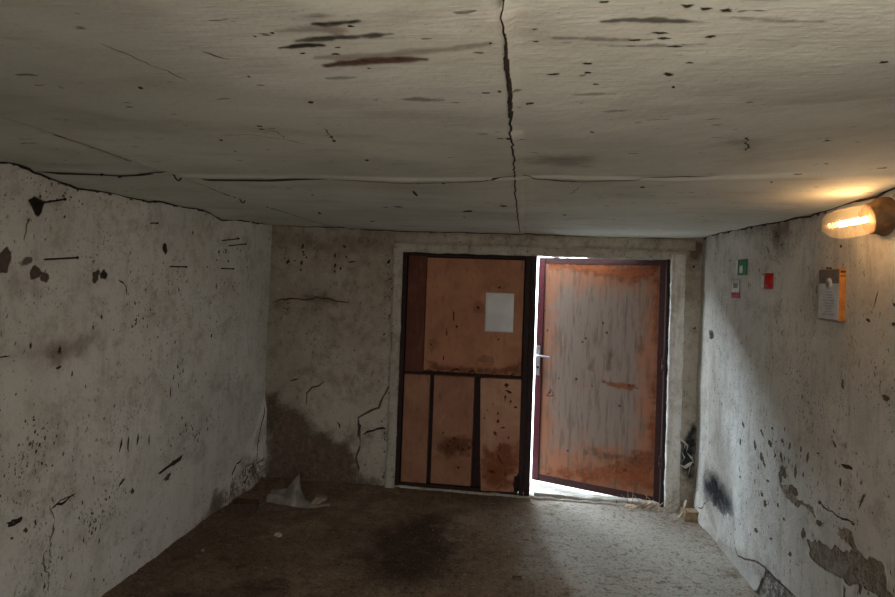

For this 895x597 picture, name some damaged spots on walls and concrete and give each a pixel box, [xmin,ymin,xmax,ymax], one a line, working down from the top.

crack [0,0,718,236]
rust [550,264,659,344]
water stain [205,393,379,520]
crack [291,378,324,404]
crack [337,386,389,472]
rust [482,409,519,488]
spalling [7,516,47,539]
spalling [56,490,110,549]
spalling [733,425,894,597]